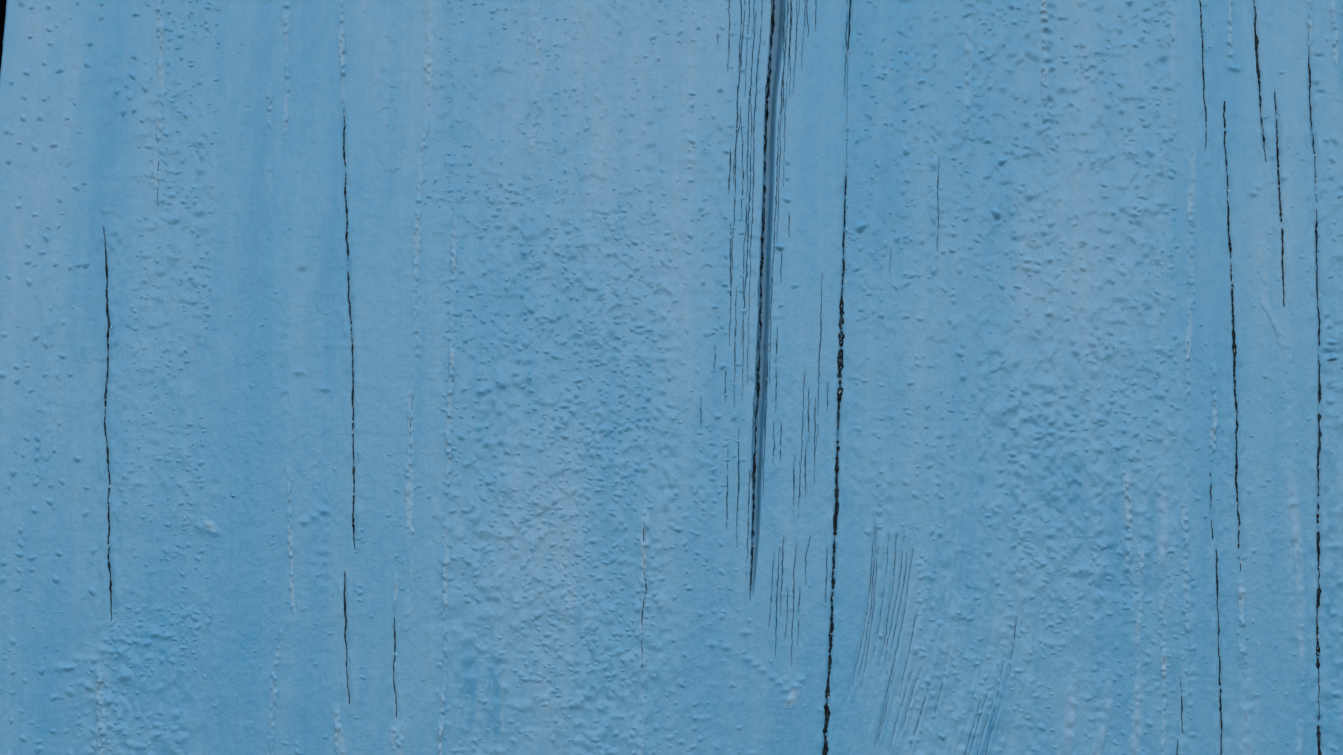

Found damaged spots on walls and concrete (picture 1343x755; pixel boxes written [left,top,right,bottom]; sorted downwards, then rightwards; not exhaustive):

crack [103,226,114,627]
crack [343,110,356,704]
crack [700,0,851,755]
crack [1175,676,1183,755]
crack [1199,0,1242,755]
crack [1254,5,1322,755]